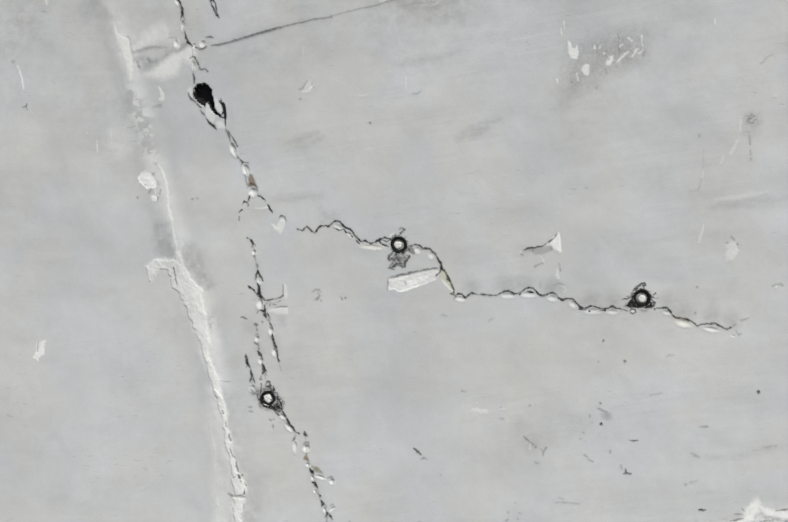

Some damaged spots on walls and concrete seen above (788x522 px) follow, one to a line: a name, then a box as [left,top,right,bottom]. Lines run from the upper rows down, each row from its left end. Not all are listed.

crack [172,0,468,85]
peeling [204,96,225,130]
peeling [136,169,162,202]
crack [224,128,392,402]
spalling [386,243,439,293]
crack [410,243,629,318]
peeling [518,231,567,295]
crack [656,287,750,339]
crack [268,410,351,522]
peeling [684,493,788,522]